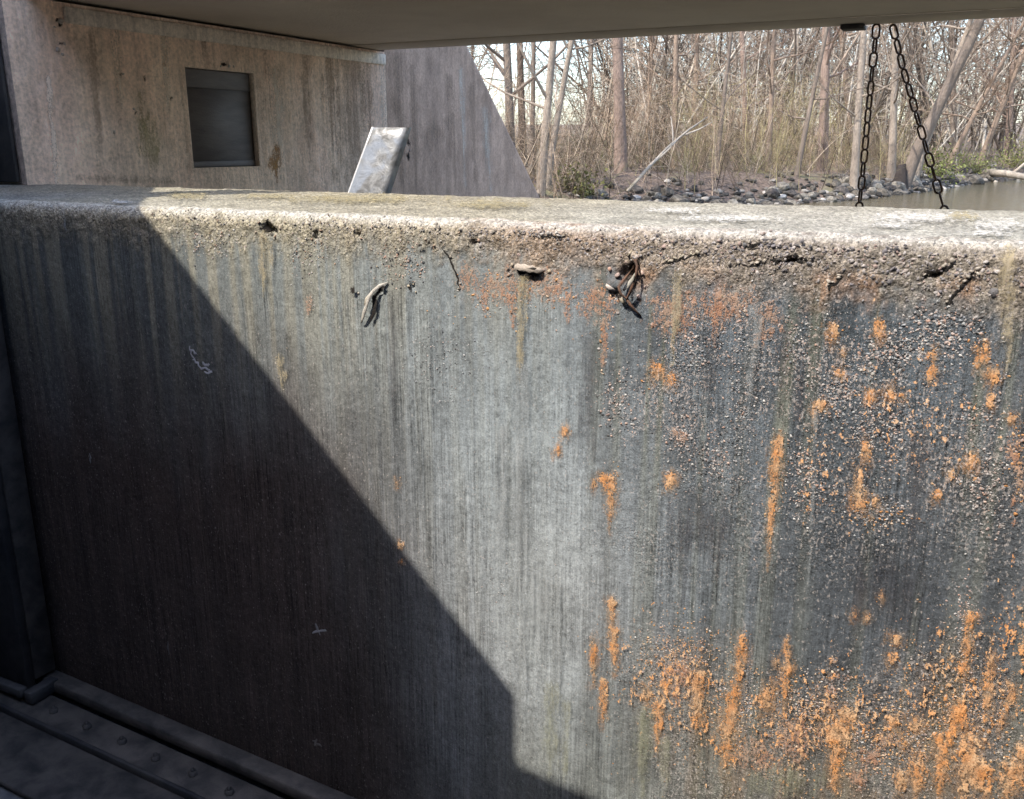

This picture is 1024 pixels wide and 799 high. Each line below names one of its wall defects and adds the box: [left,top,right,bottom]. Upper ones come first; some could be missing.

crack [441,247,461,291]
rust [454,249,628,375]
rust [642,252,794,358]
crack [920,258,981,305]
rust [745,313,1024,558]
rust [589,462,623,523]
rust [585,585,1024,799]